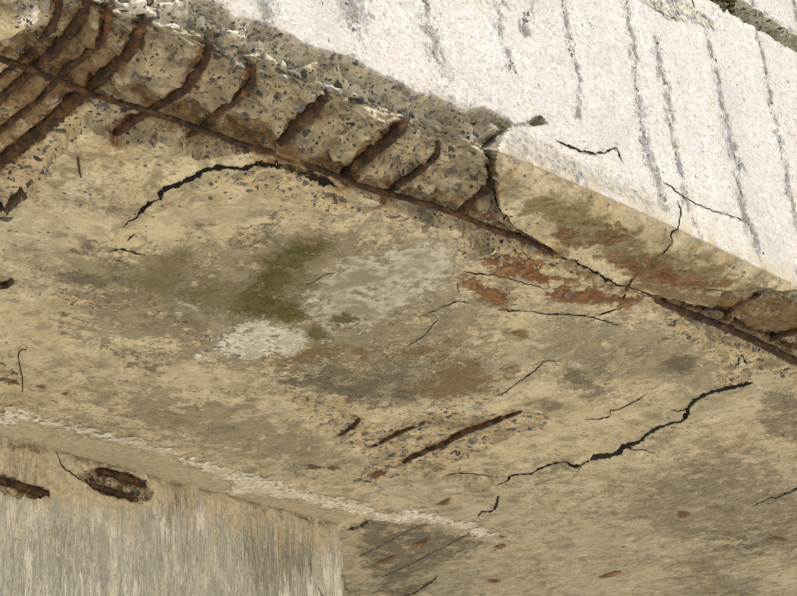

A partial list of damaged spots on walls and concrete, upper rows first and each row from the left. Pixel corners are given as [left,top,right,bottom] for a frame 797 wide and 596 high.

rust [0,6,133,146]
crack [110,159,337,262]
rust [120,84,372,186]
water stain [34,199,521,411]
spalling [0,0,615,292]
crack [556,140,622,161]
rust [455,220,797,350]
water stain [479,162,781,299]
spalling [645,276,797,402]
spalling [78,467,154,504]
crack [382,355,753,578]
crack [754,487,797,506]